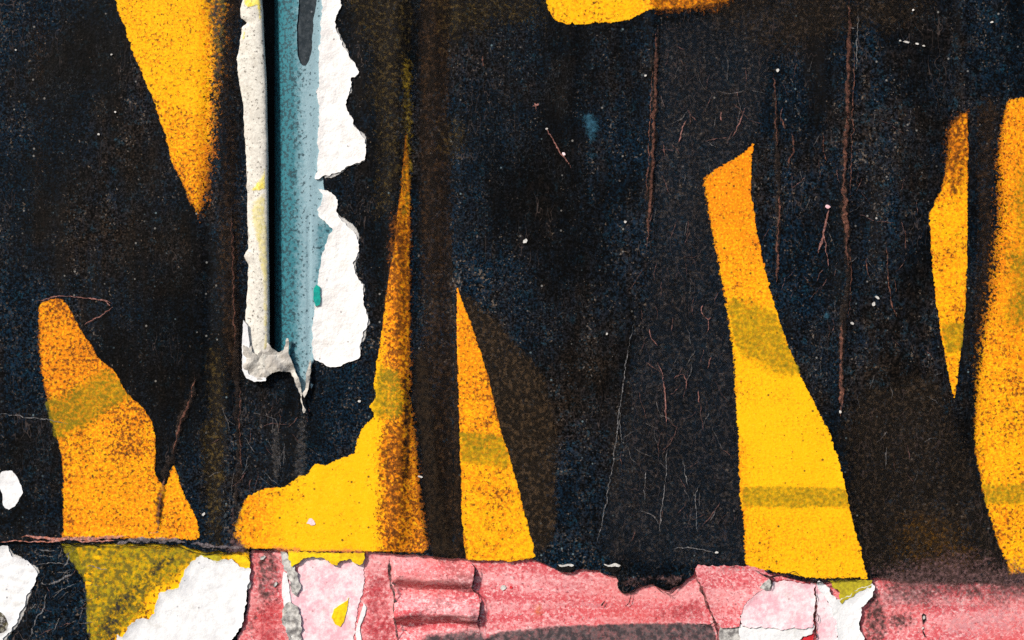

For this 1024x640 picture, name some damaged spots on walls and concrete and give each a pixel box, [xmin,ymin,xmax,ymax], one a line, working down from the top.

peeling [313,285,321,306]